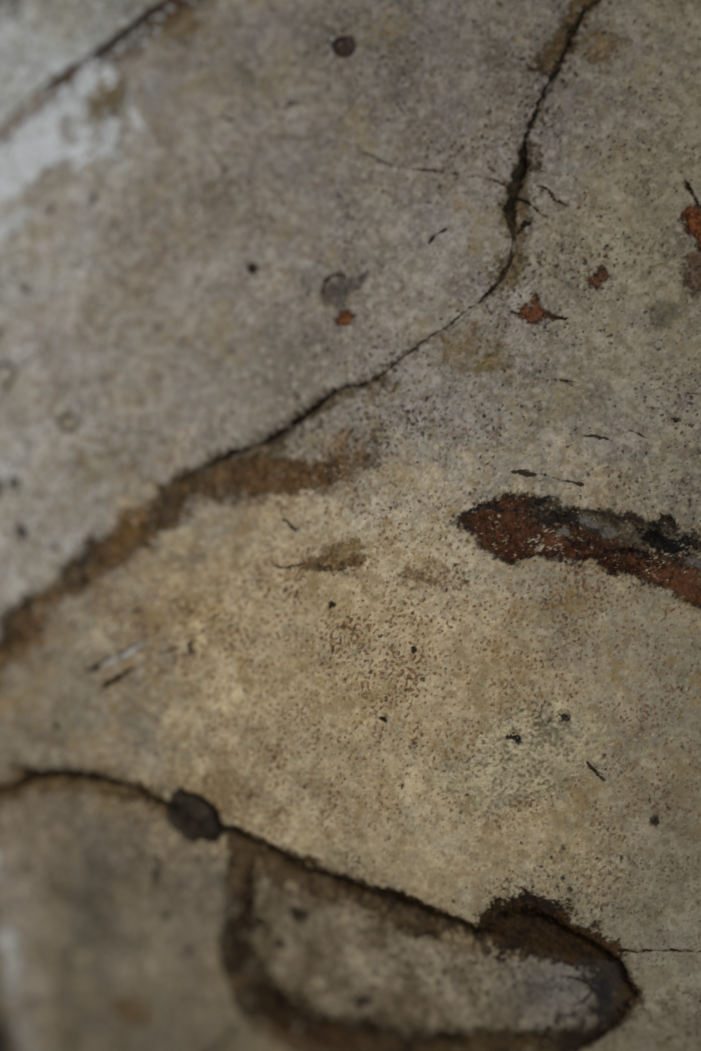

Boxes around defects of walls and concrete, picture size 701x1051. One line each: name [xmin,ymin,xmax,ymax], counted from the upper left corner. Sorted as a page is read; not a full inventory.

crack [0,0,174,127]
efflorescence [0,44,146,241]
crack [177,0,598,483]
rust [681,181,701,297]
rust [586,266,609,289]
rust [510,294,568,325]
crack [584,430,644,440]
crack [511,469,584,486]
crack [586,761,606,781]
crack [0,764,174,811]
crack [216,823,245,840]
crack [620,947,700,955]